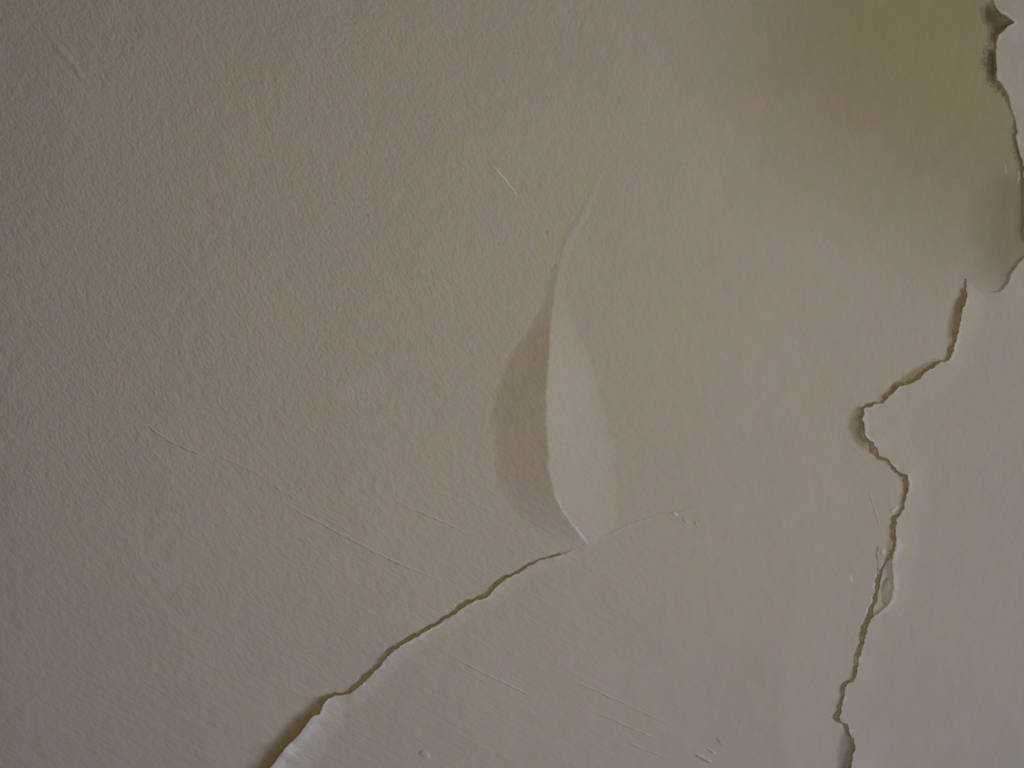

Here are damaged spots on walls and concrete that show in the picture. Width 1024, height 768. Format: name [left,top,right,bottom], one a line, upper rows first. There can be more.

peeling [987,0,1024,182]
crack [254,503,709,768]
crack [830,279,969,768]